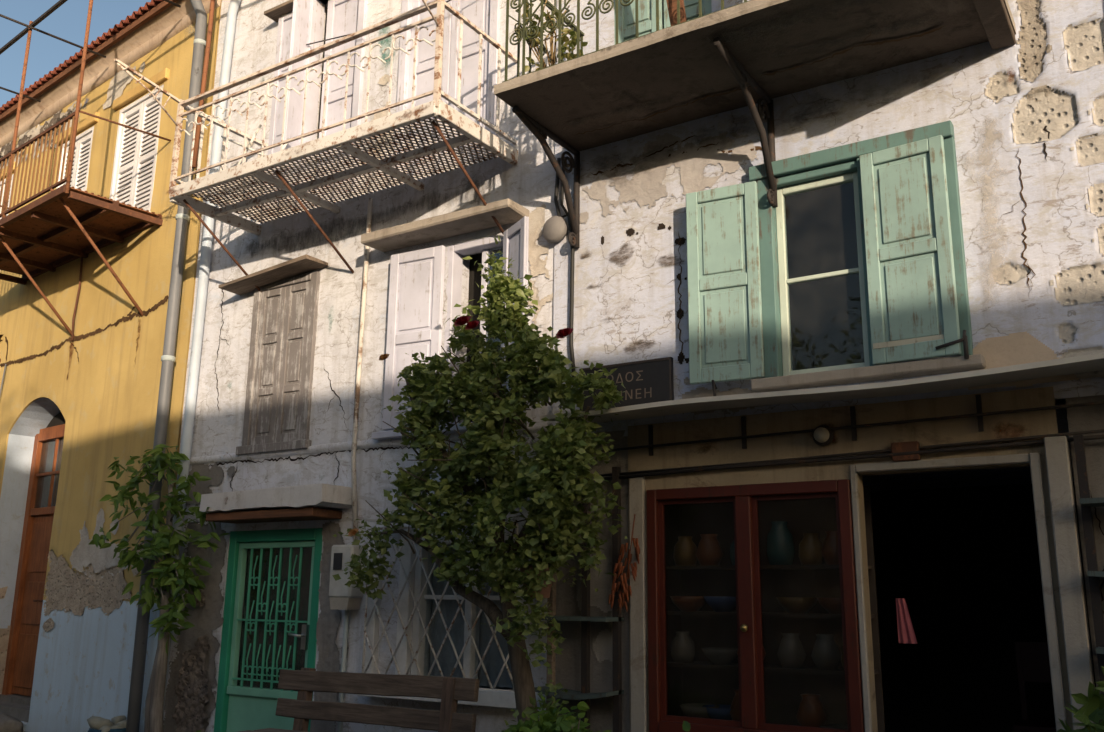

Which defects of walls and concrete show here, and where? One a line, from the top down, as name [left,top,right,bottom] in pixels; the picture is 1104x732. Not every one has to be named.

peeling [103,62,145,109]
peeling [0,101,82,169]
flaking render [979,0,1104,306]
crack [1000,126,1050,291]
leakage [610,244,633,264]
leakage [625,340,654,352]
flaking render [1058,323,1104,358]
flaking render [42,508,143,632]